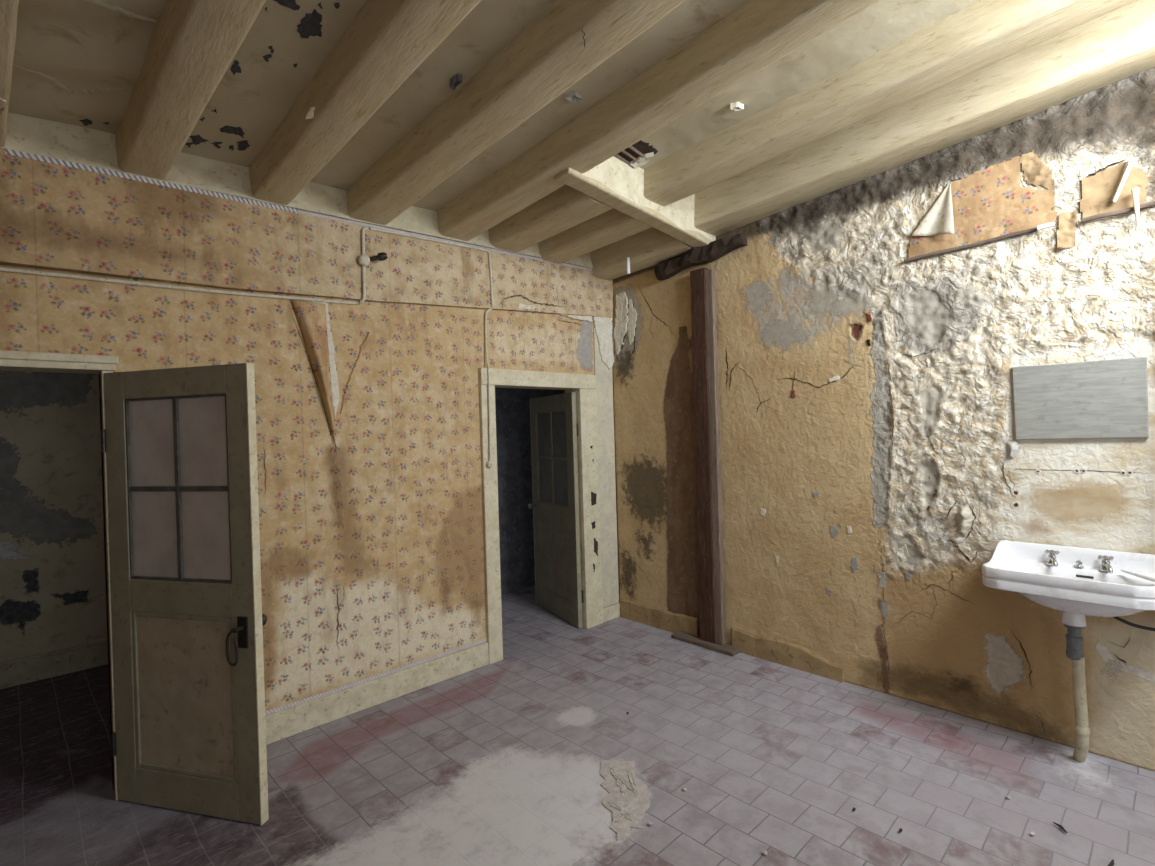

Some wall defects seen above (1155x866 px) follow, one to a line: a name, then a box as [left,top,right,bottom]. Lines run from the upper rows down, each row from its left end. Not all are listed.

peeling [265,0,340,39]
peeling [185,108,250,151]
spalling [903,286,987,357]
peeling [0,371,95,418]
peeling [288,300,369,451]
crack [726,352,862,413]
spalling [918,386,944,513]
peeling [0,437,97,547]
water stain [620,457,668,597]
peeling [0,569,41,636]
crack [898,539,978,623]
spalling [983,632,1032,694]